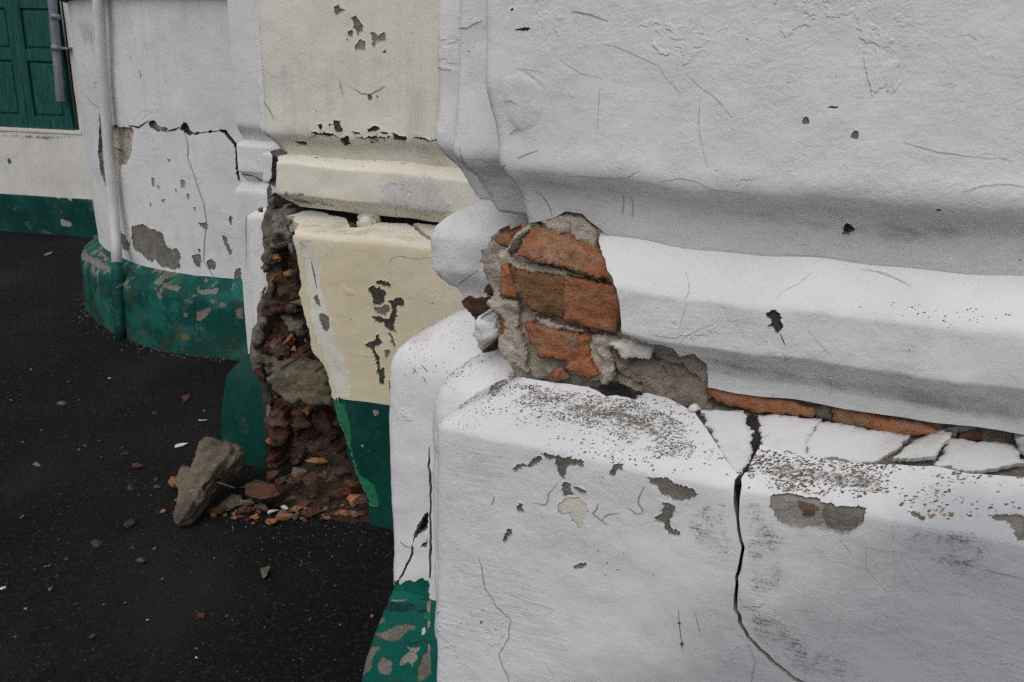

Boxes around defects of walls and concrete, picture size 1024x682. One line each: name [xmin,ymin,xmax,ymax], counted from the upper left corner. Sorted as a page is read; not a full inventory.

crack [128,121,240,277]
crack [279,183,440,228]
peeling [121,223,220,322]
peeling [300,240,379,506]
peeling [363,278,406,391]
spalling [461,211,1024,484]
peeling [511,450,589,528]
peeling [646,475,700,537]
crack [734,483,742,509]
spalling [768,491,870,535]
crack [736,543,745,602]
peeling [364,599,440,681]